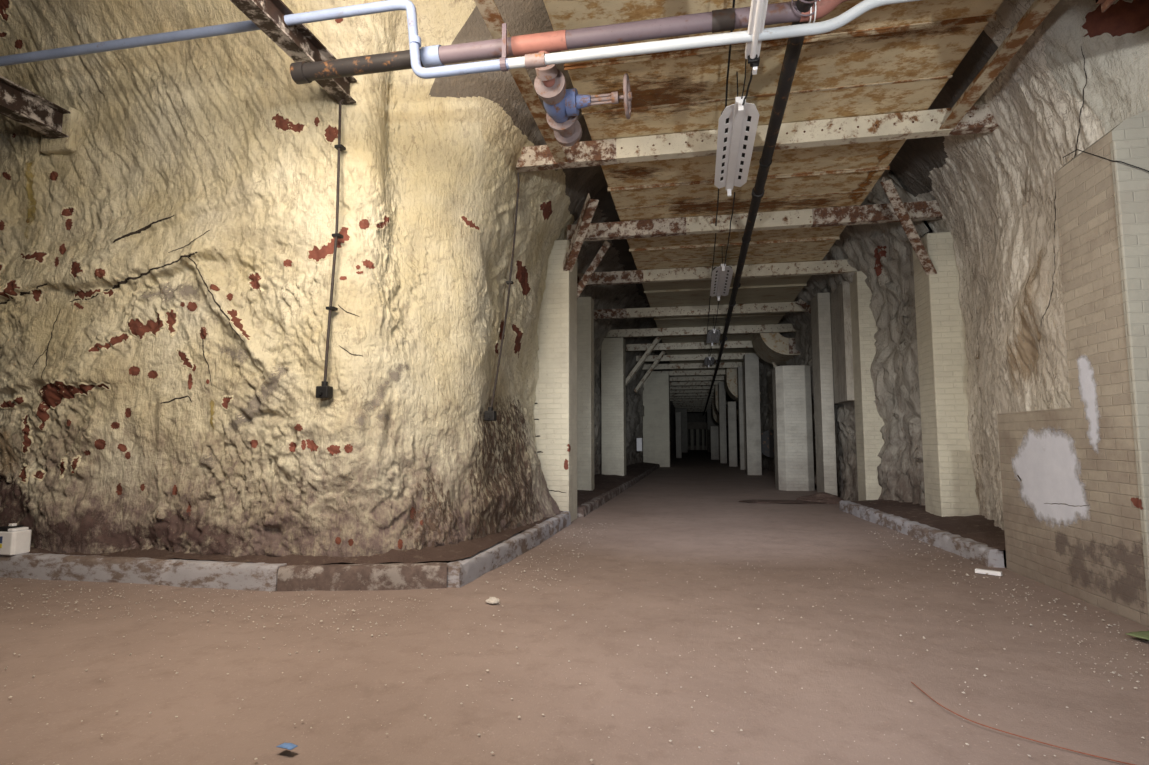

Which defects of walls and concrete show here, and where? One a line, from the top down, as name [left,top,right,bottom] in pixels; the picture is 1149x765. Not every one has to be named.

rust [635,43,746,56]
rust [803,25,964,44]
rust [600,76,708,119]
rust [613,166,654,179]
rust [849,151,890,201]
rust [670,198,836,214]
crack [113,215,174,243]
crack [0,283,47,304]
crack [33,230,244,381]
crack [160,333,212,404]
leakage [407,395,539,549]
leakage [1056,534,1145,606]